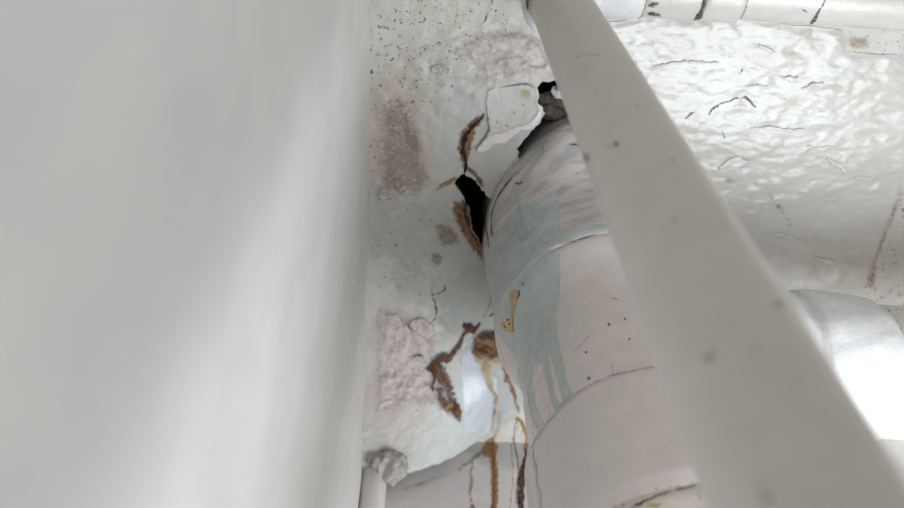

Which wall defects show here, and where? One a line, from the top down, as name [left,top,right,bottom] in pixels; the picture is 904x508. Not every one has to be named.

peeling [476,84,568,153]
crack [686,96,756,139]
crack [438,114,544,247]
corrosion [439,200,483,260]
corrosion [427,322,528,508]